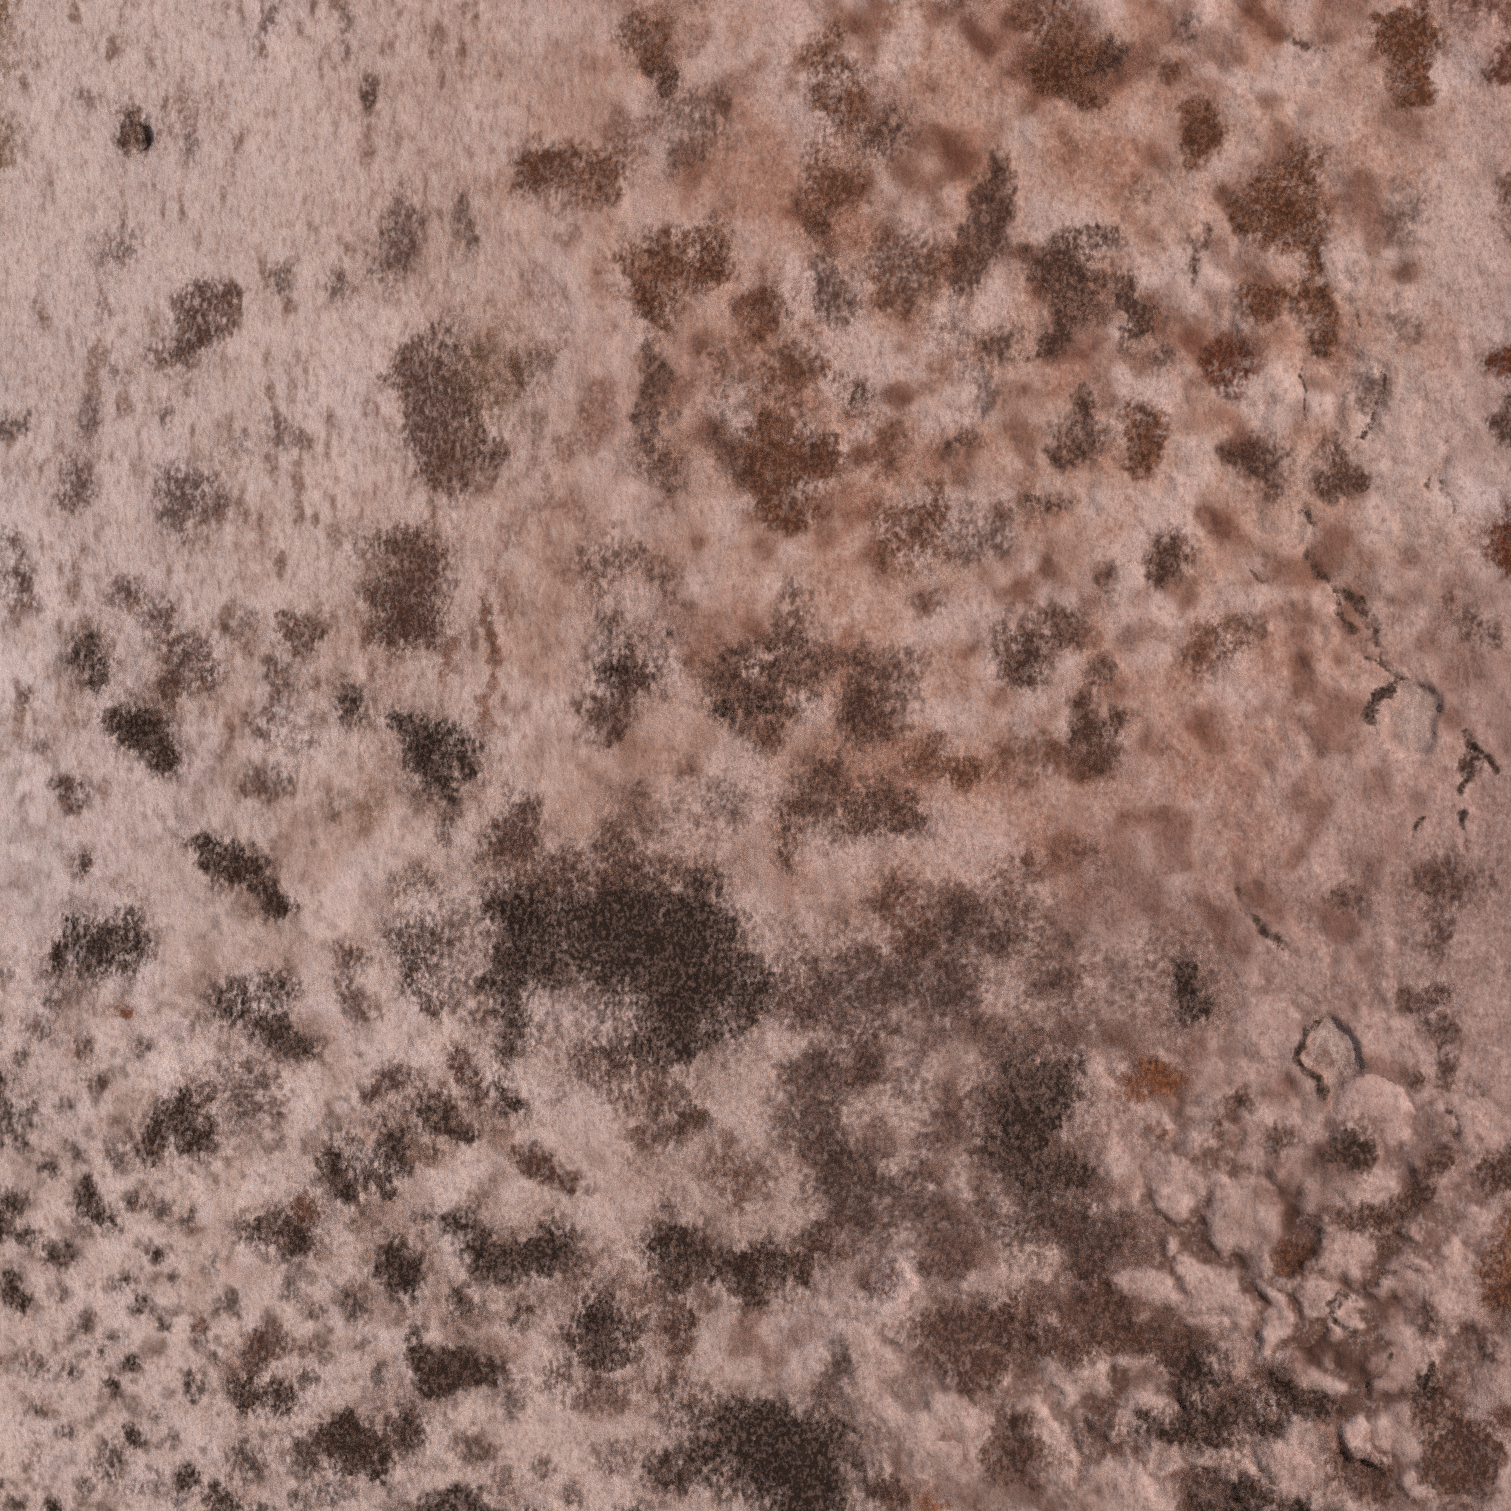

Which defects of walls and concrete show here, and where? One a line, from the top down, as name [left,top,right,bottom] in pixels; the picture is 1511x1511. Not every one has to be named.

damp [947,147,1173,408]
damp [377,320,511,500]
crack [1360,372,1387,439]
damp [101,576,225,776]
crack [1299,510,1398,678]
corrosion [1483,503,1511,576]
damp [386,710,484,844]
crack [1414,728,1500,830]
damp [51,907,156,979]
crack [1235,887,1282,947]
damp [107,970,316,1168]
damp [285,794,1345,1511]